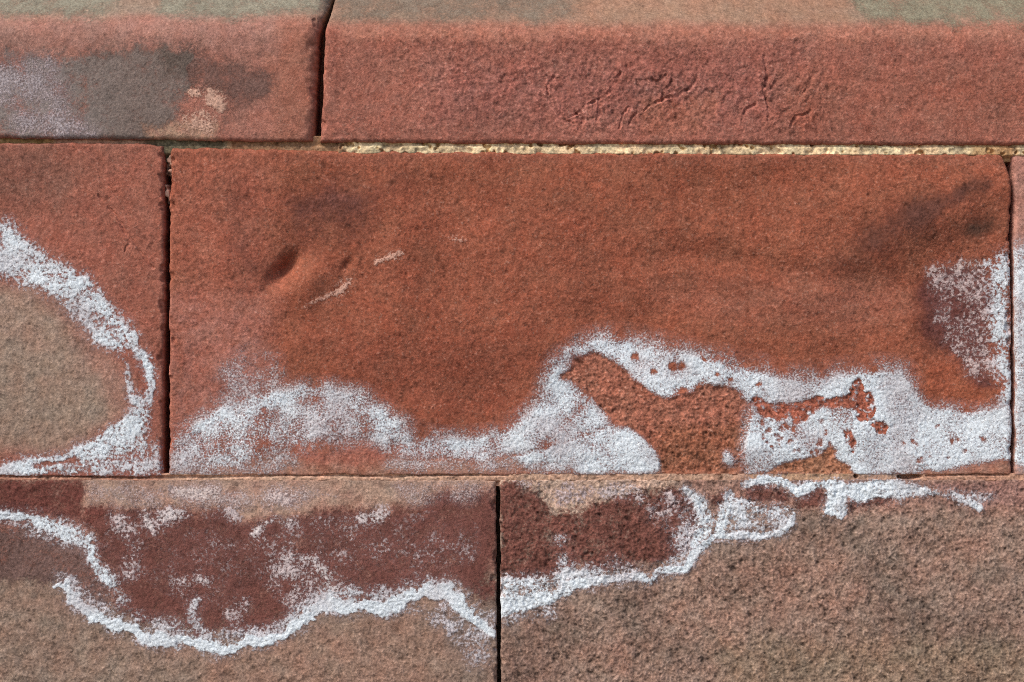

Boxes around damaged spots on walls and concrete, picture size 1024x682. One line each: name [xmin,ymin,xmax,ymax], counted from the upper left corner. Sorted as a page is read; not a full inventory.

water stain [0,43,272,140]
crack [546,70,699,130]
crack [741,54,813,128]
water stain [0,217,1024,667]